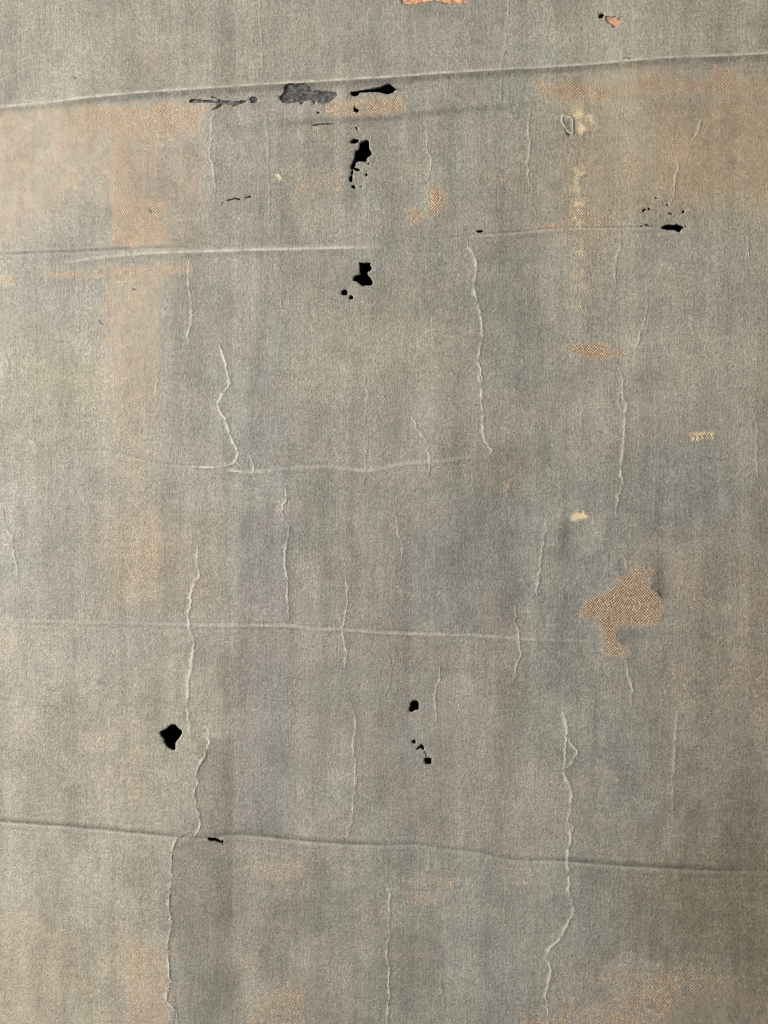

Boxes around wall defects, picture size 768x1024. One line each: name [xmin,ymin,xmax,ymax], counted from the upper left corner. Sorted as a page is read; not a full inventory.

peeling [280,84,337,114]
crack [190,343,256,476]
crack [163,545,213,1024]
crack [543,709,580,1024]